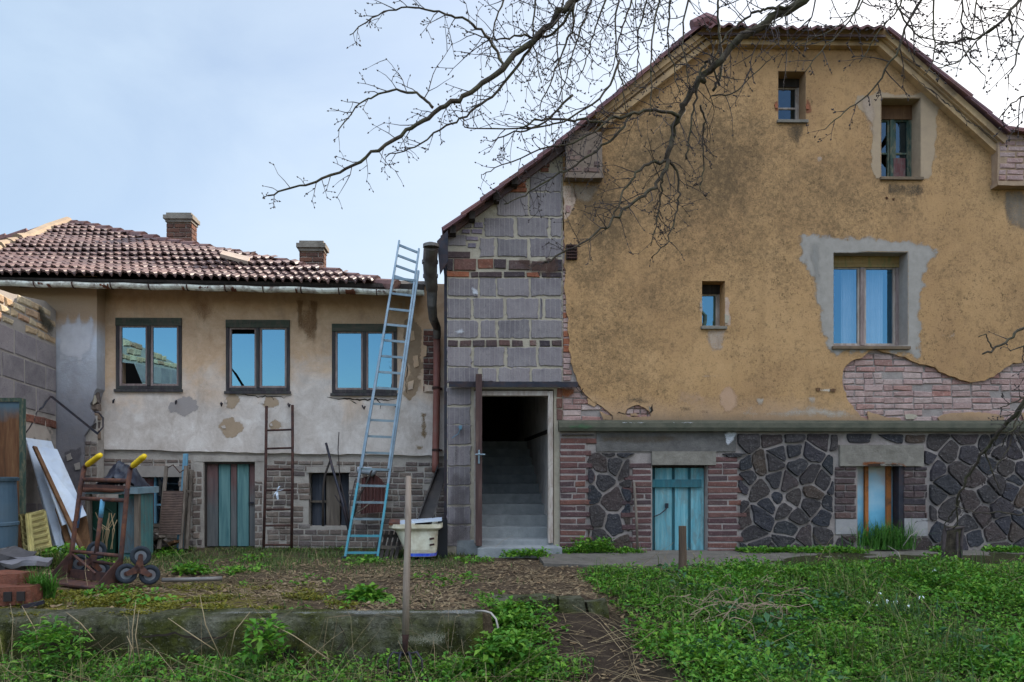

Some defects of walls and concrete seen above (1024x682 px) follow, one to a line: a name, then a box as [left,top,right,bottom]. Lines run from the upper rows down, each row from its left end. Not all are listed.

peeling [168,396,199,416]
peeling [218,394,244,438]
damp [295,296,319,341]
peeling [390,299,433,401]
spalling [563,185,653,420]
spalling [816,350,1024,421]